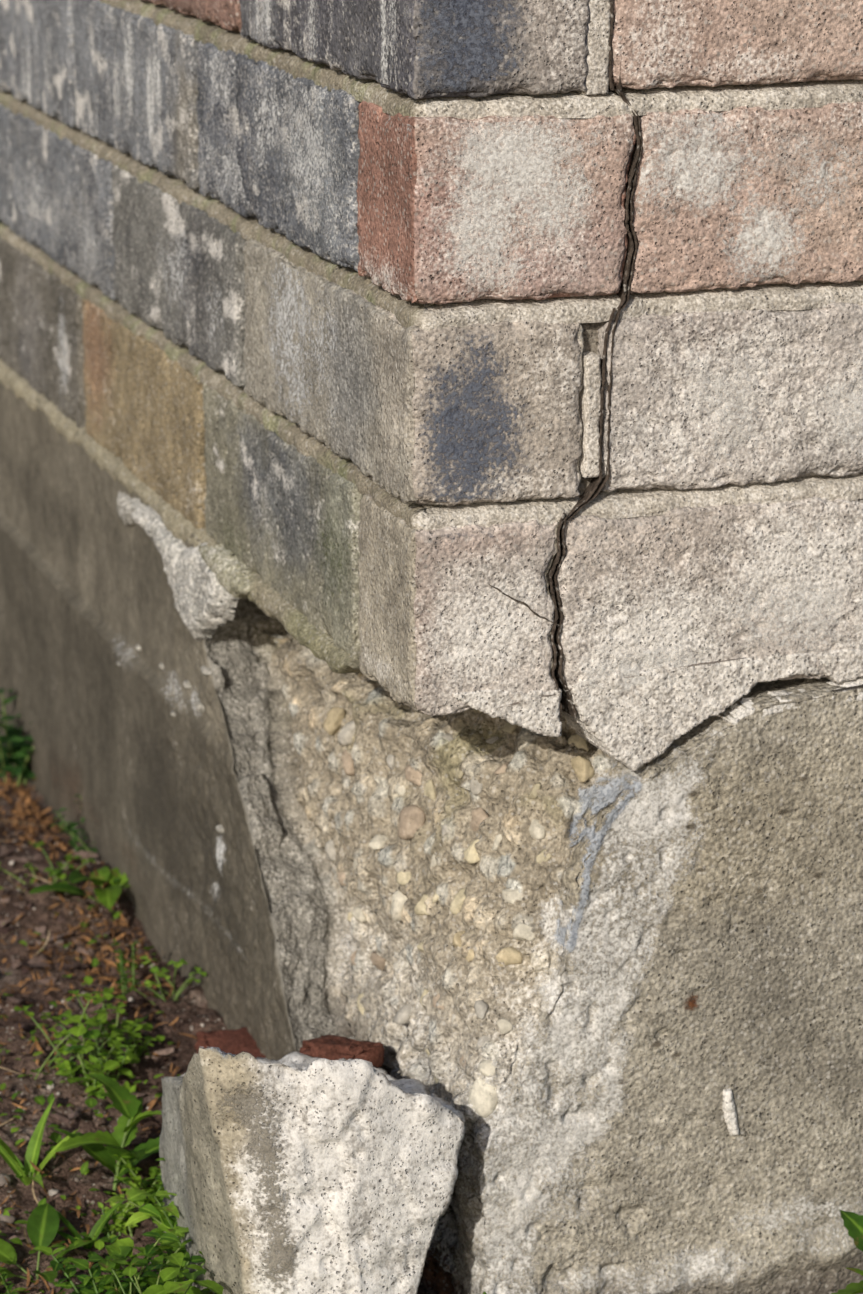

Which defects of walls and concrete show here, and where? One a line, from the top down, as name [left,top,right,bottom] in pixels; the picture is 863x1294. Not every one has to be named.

crack [489,0,643,720]
crack [677,657,746,669]
peeling [0,786,133,1057]
peeling [96,1046,174,1106]
spalling [159,596,845,1294]